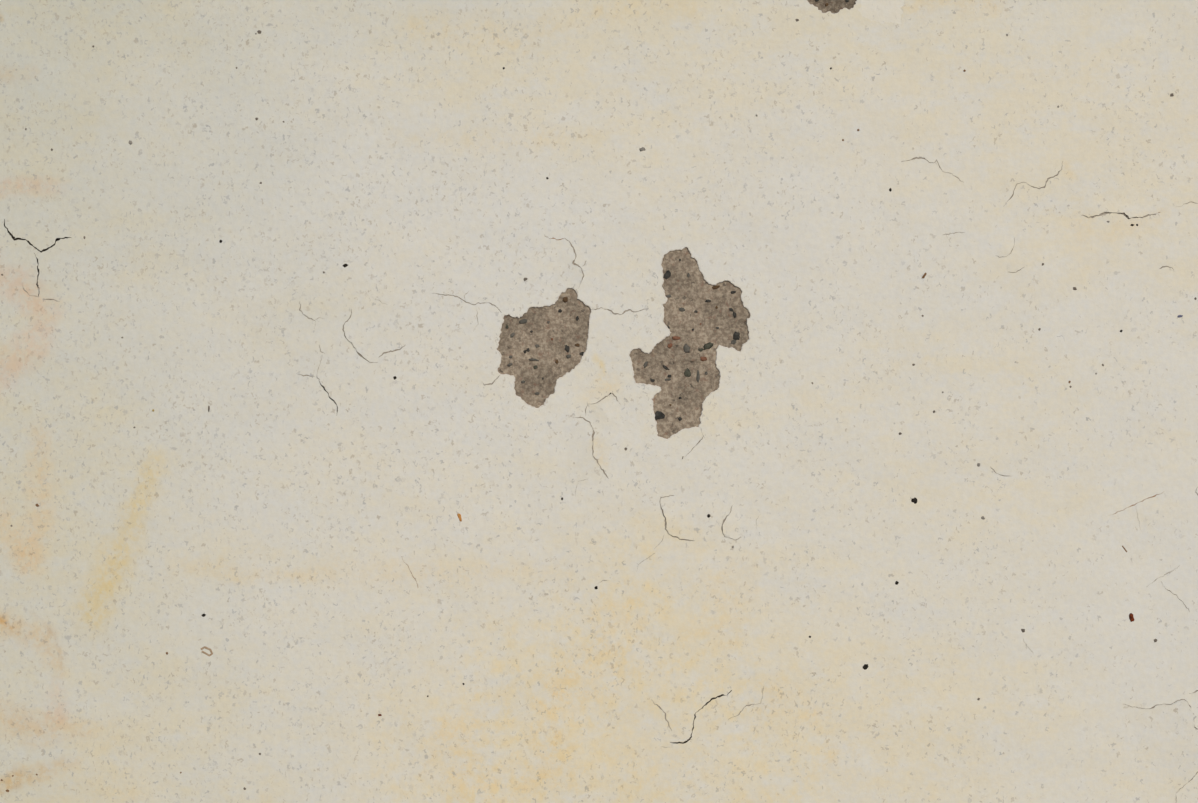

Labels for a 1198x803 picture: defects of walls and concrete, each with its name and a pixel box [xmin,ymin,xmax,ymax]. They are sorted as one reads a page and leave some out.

spalling [807,0,857,14]
crack [1003,161,1063,207]
crack [1083,194,1194,219]
crack [4,219,71,302]
peeling [496,287,592,409]
peeling [629,247,751,440]
crack [653,687,764,748]